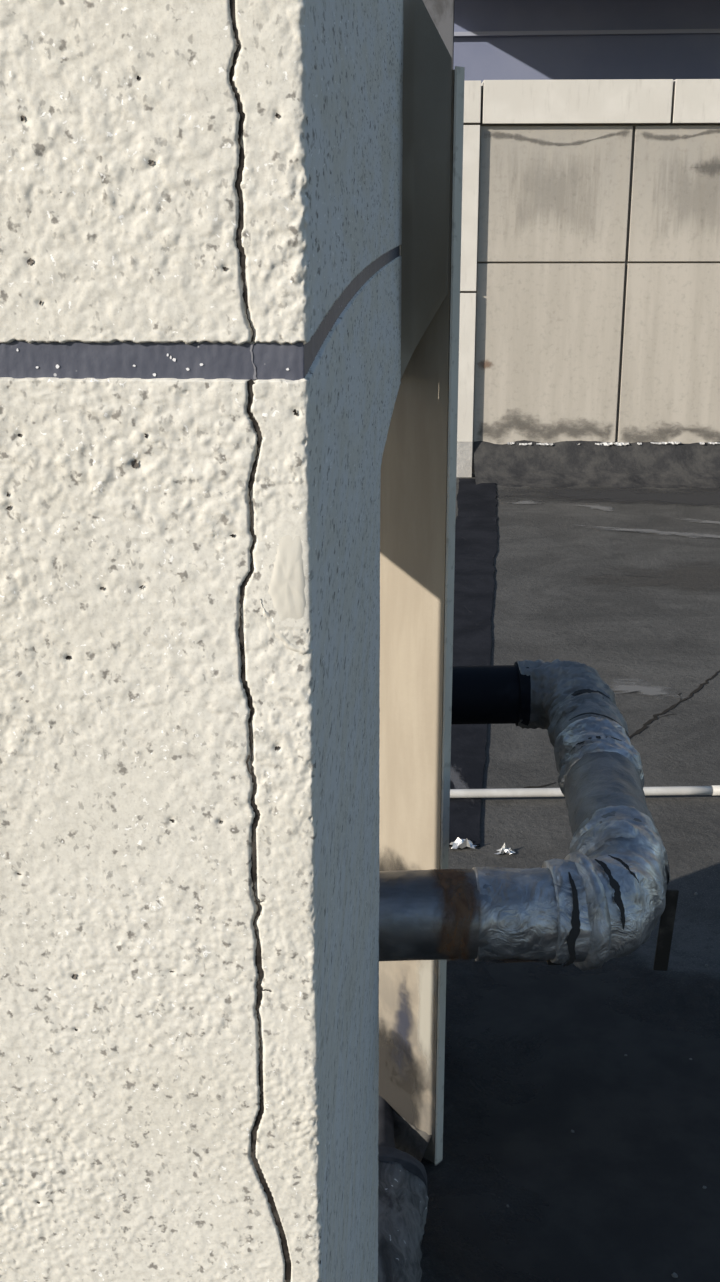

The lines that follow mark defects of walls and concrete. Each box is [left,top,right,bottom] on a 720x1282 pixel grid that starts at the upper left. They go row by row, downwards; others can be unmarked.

damp [479,417,720,443]
crack [229,0,291,1282]
crack [629,670,720,738]